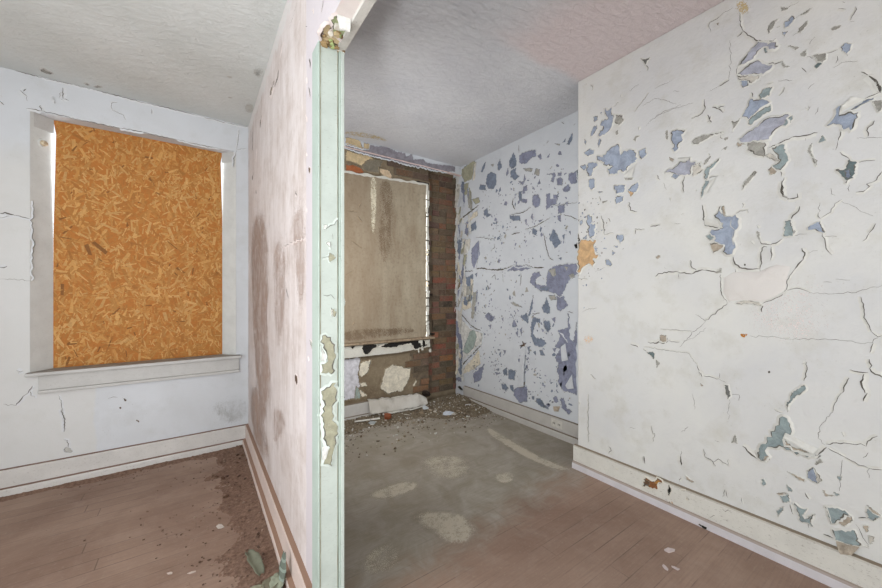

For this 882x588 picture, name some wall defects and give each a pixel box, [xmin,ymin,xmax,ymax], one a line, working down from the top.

leakage [378,180,397,265]
crack [614,10,777,124]
peeling [705,202,748,257]
peeling [664,5,854,200]
crack [776,170,802,202]
peeling [807,97,882,190]
crack [836,56,882,99]
leakage [214,206,307,465]
flaking render [308,106,648,468]
crack [630,223,882,470]
crack [58,395,74,453]
peeling [731,384,882,555]